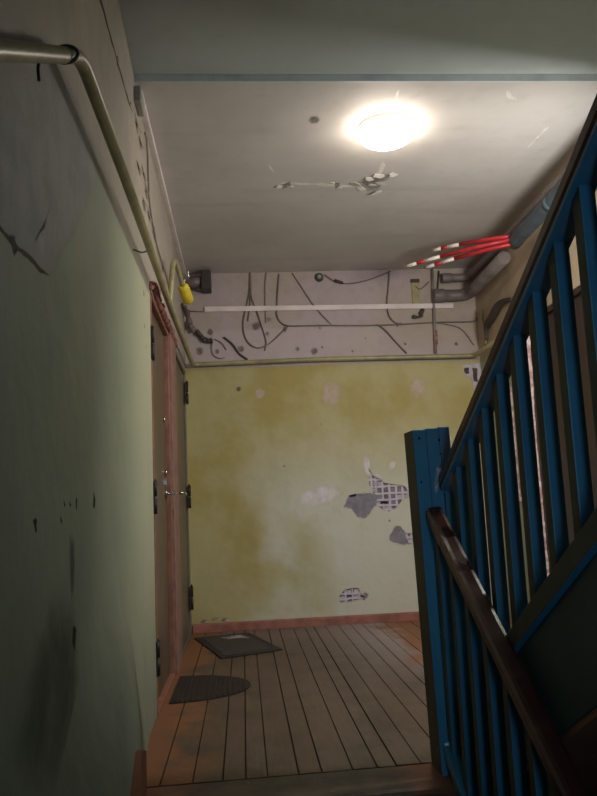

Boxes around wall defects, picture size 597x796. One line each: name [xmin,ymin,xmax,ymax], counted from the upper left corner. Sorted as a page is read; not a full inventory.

crack [100,0,131,108]
flaking render [330,173,398,195]
flaking render [297,475,409,519]
flaking render [389,525,413,545]
flaking render [339,588,367,603]